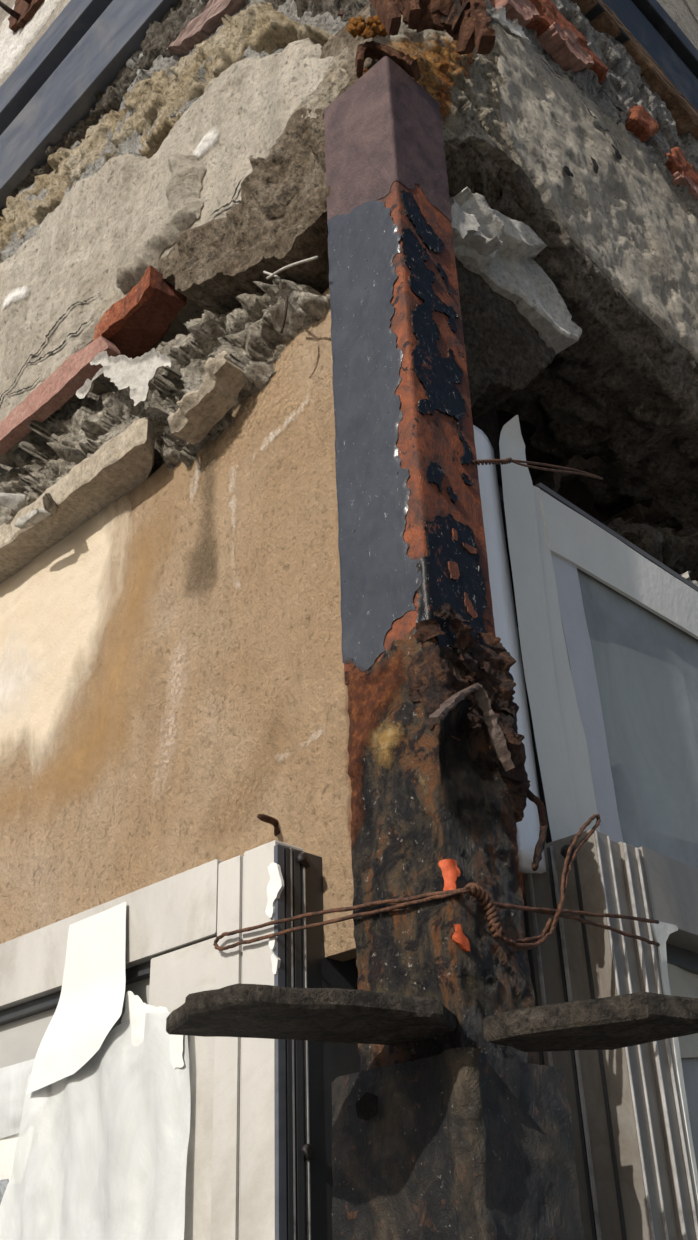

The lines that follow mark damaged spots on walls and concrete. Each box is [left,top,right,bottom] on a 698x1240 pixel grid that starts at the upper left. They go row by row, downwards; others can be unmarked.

corrosion [393,37,474,118]
crack [0,293,99,401]
peeling [76,47,491,672]
spalling [389,0,698,532]
corrosion [345,603,549,889]